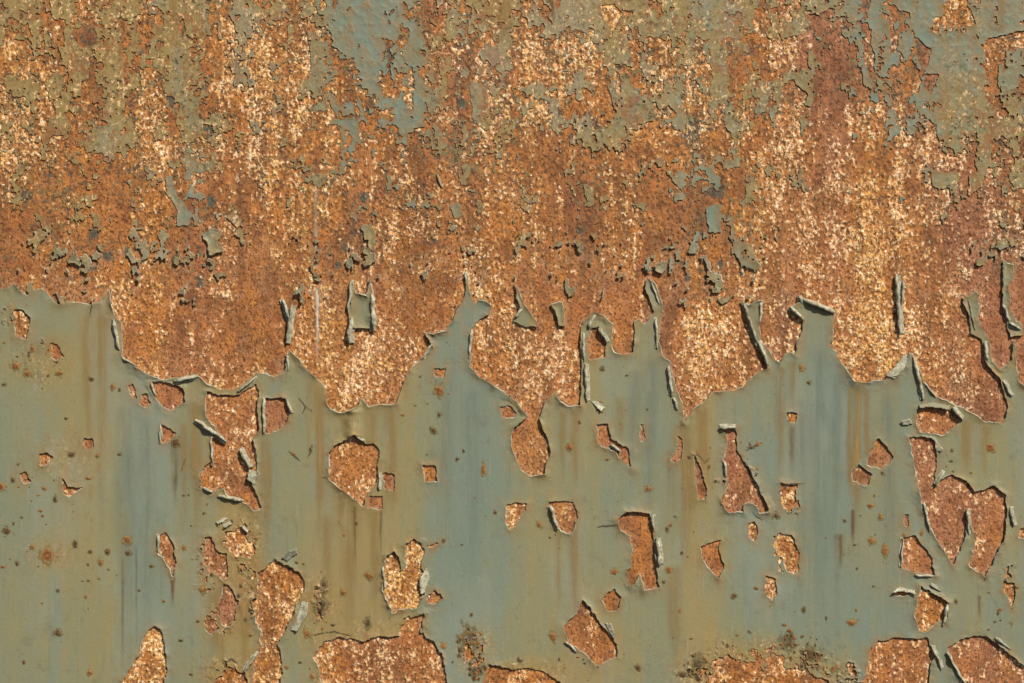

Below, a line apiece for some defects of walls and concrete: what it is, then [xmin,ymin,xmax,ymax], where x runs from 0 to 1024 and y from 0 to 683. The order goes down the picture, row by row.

corrosion [0,0,1024,484]
peeling [194,384,293,511]
corrosion [72,540,117,582]
peeling [619,512,663,590]
peeling [688,402,1024,683]
corrosion [840,494,890,565]
peeling [198,518,327,683]
peeling [314,539,447,683]
corrosion [441,613,487,682]
peeling [564,589,621,665]
corrosion [676,652,710,681]
corrosion [779,622,836,673]